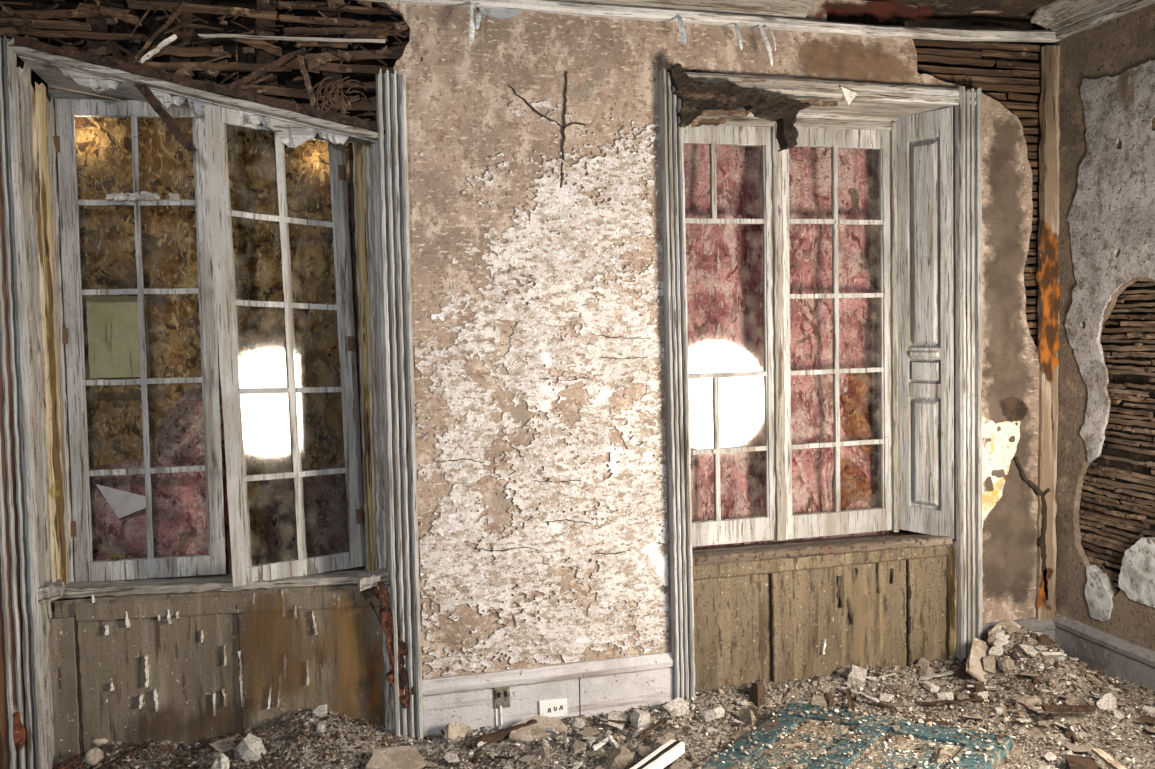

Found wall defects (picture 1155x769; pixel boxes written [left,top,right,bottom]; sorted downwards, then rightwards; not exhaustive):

flaking render [0,0,410,122]
crack [508,71,586,188]
spalling [666,63,857,152]
leakage [818,1,934,18]
rust [1036,221,1060,382]
peeling [1065,60,1155,622]
peeling [982,417,1020,529]
rust [1037,568,1053,610]